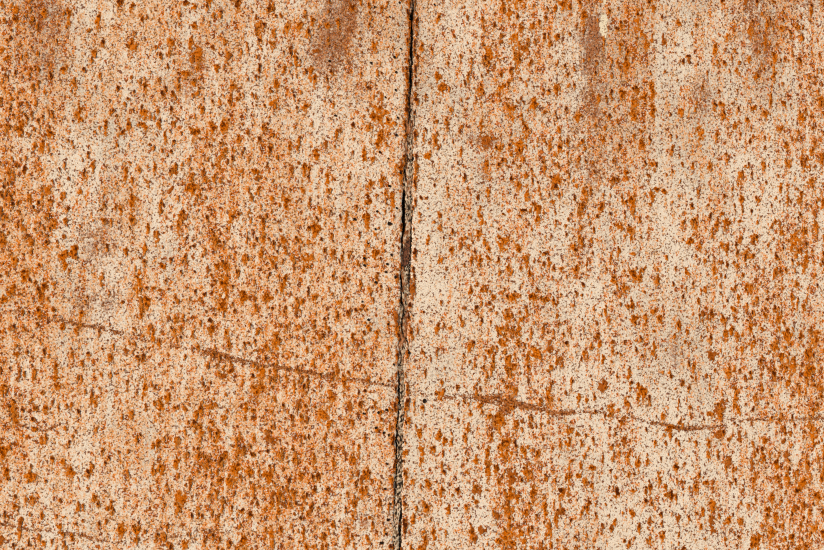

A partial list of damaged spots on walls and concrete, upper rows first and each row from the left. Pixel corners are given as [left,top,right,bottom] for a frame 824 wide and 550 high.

corrosion [0,0,463,550]
crack [393,0,416,550]
corrosion [350,0,824,550]